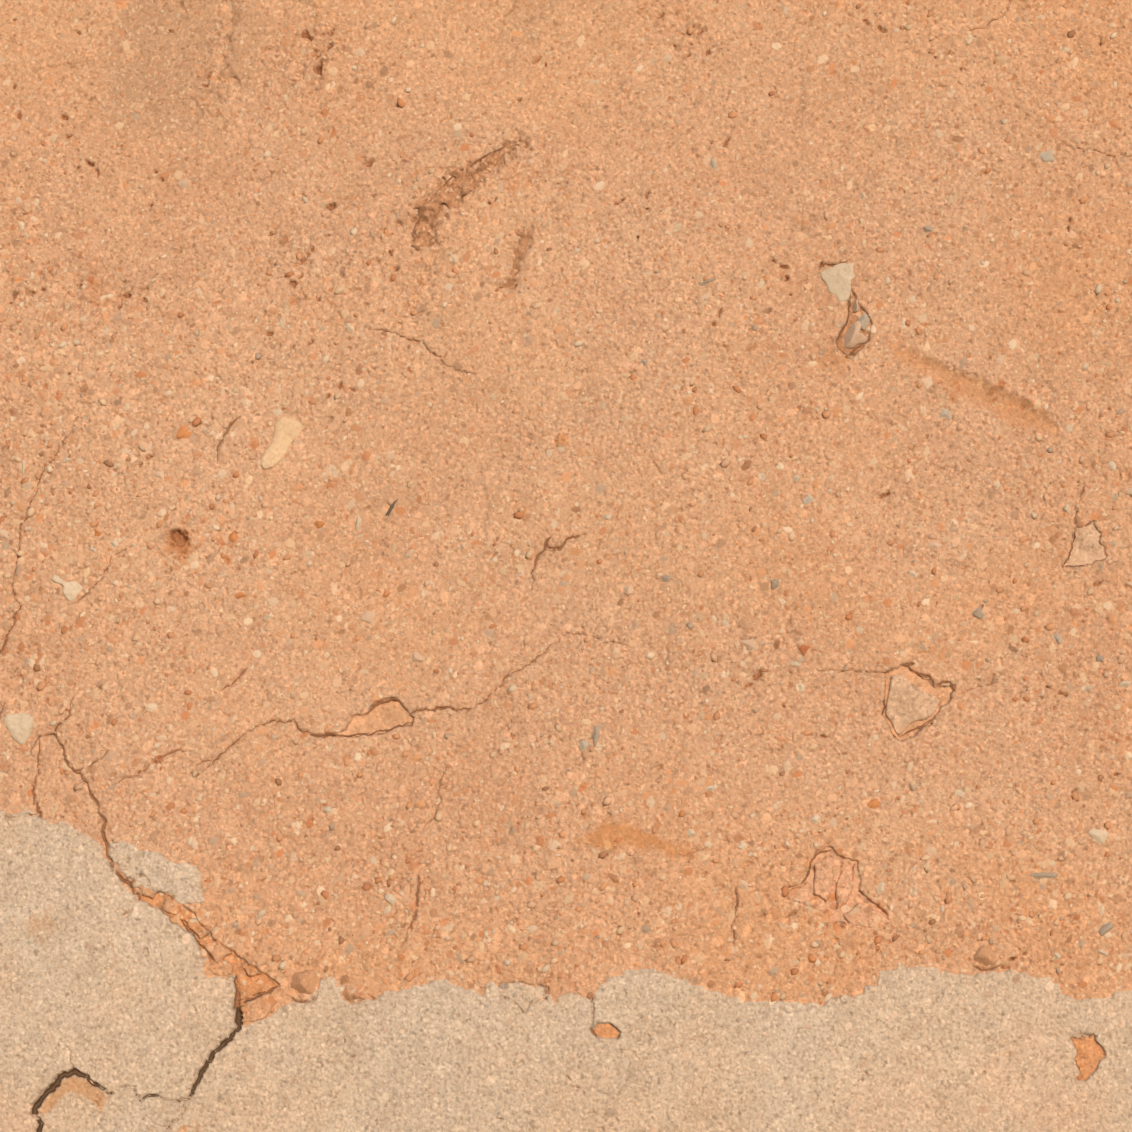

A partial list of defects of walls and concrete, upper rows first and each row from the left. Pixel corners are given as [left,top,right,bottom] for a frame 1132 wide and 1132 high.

spalling [818,261,871,358]
crack [0,413,82,652]
crack [530,533,586,591]
crack [411,632,617,714]
spalling [875,663,954,741]
crack [5,695,336,915]
spalling [130,875,279,1009]
crack [402,871,421,945]
spalling [788,848,892,928]
crack [32,1007,242,1132]
spalling [590,997,620,1040]
peeling [1071,1034,1105,1080]